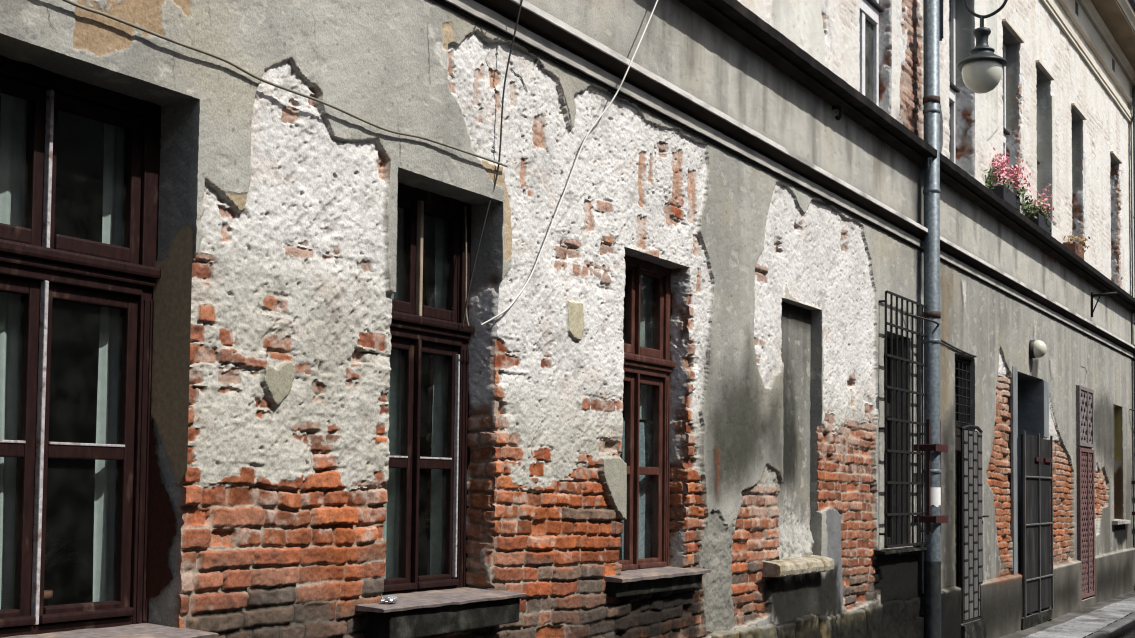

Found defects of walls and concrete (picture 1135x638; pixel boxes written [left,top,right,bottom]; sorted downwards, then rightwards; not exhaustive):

peeling [73,0,192,57]
spalling [820,0,833,60]
spalling [146,58,395,638]
spalling [418,20,715,638]
leakage [614,587,701,638]
spalling [730,463,783,626]
leakage [765,567,844,638]
spalling [754,181,880,609]
spalling [986,347,1013,576]
spalling [1047,393,1074,565]
spalling [1094,463,1110,535]